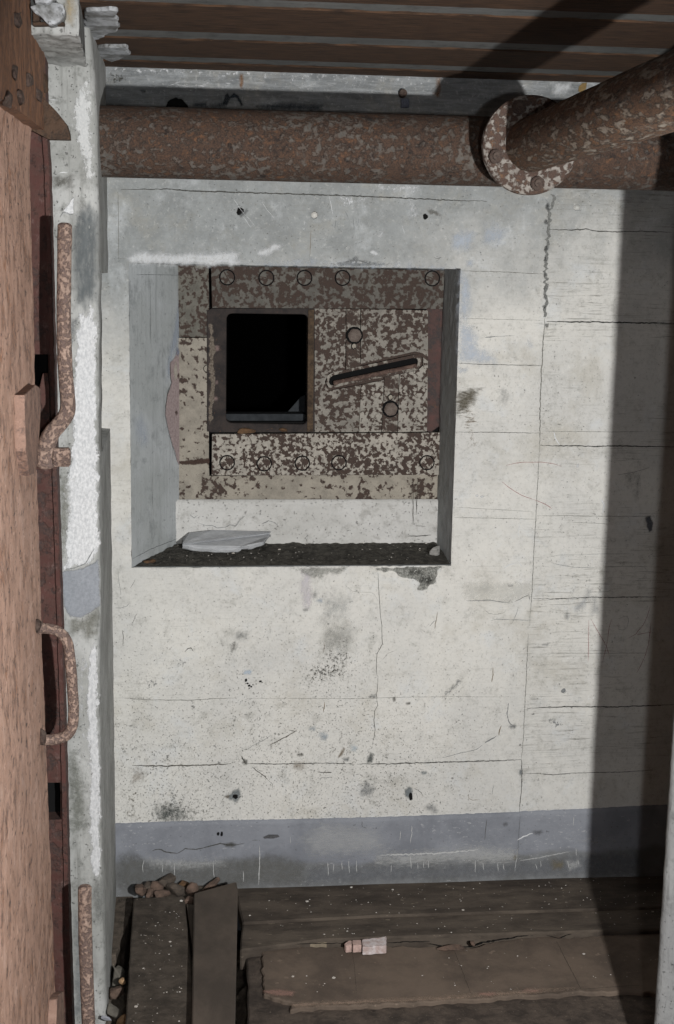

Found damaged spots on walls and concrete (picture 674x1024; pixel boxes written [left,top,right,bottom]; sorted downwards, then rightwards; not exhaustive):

spalling [377,543,441,590]
crack [354,579,385,740]
crack [153,843,243,854]